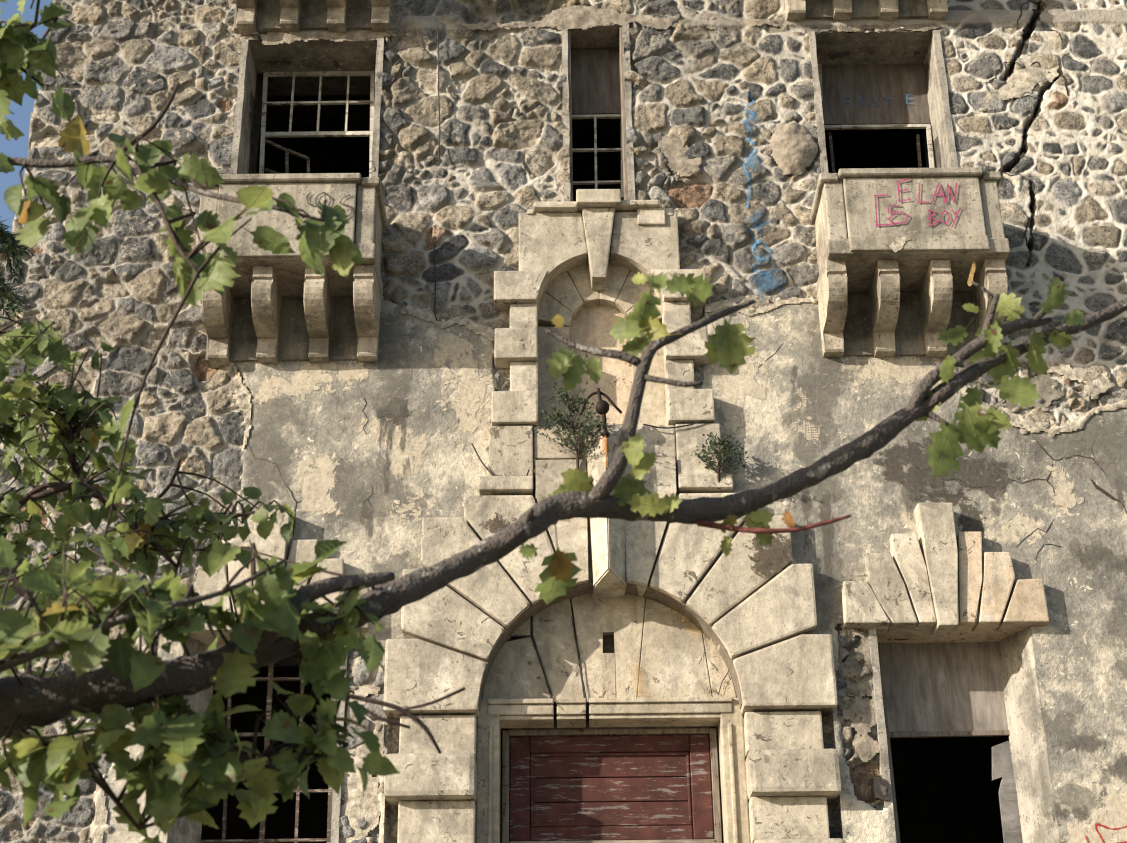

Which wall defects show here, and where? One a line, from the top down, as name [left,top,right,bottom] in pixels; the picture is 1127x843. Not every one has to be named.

crack [979,0,1069,265]
flaking render [994,349,1127,437]
water stain [360,507,373,537]
water stain [375,398,412,494]
water stain [873,437,1025,543]
crack [908,441,1127,560]
crack [1000,580,1016,624]
crack [510,616,557,717]
crack [571,616,588,716]
flaking render [838,626,888,795]